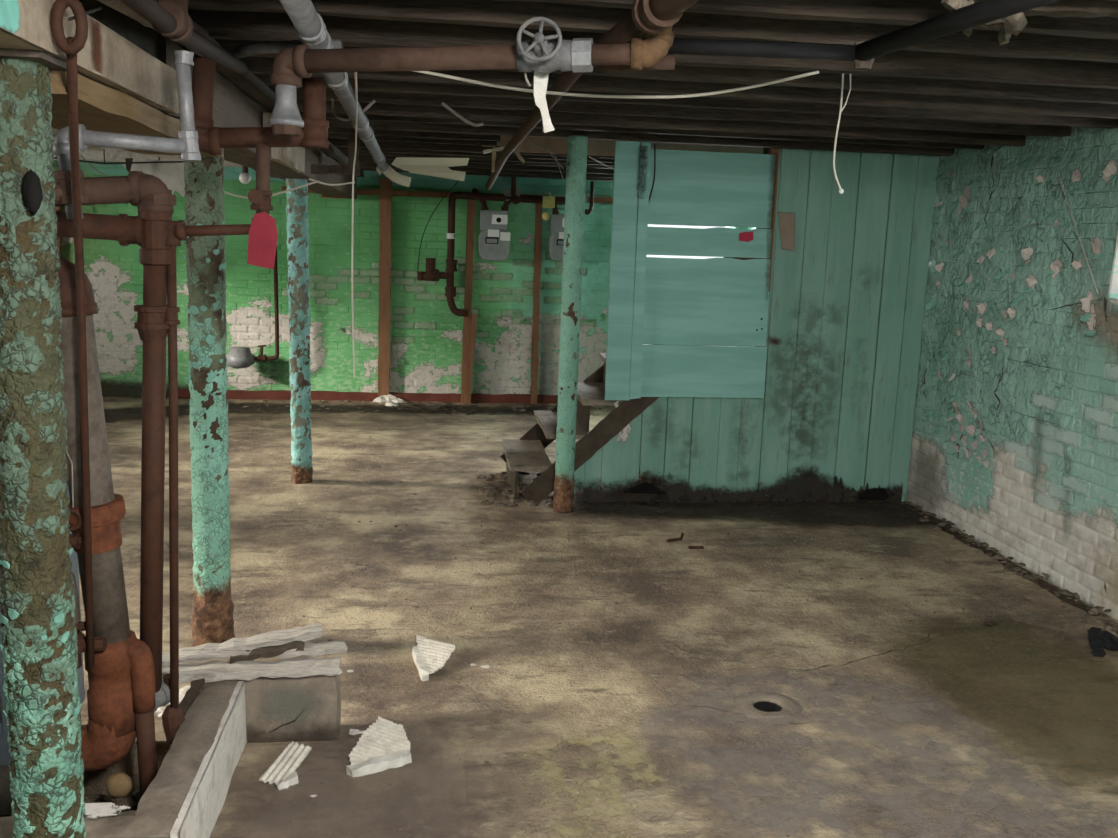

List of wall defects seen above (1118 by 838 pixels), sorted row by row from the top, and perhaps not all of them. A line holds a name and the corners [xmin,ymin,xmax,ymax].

peeling [1101,159,1117,185]
peeling [84,255,143,376]
peeling [177,253,563,416]
peeling [578,307,608,382]
peeling [941,237,1104,355]
peeling [905,345,1118,620]
peeling [0,608,19,624]
peeling [41,612,70,643]